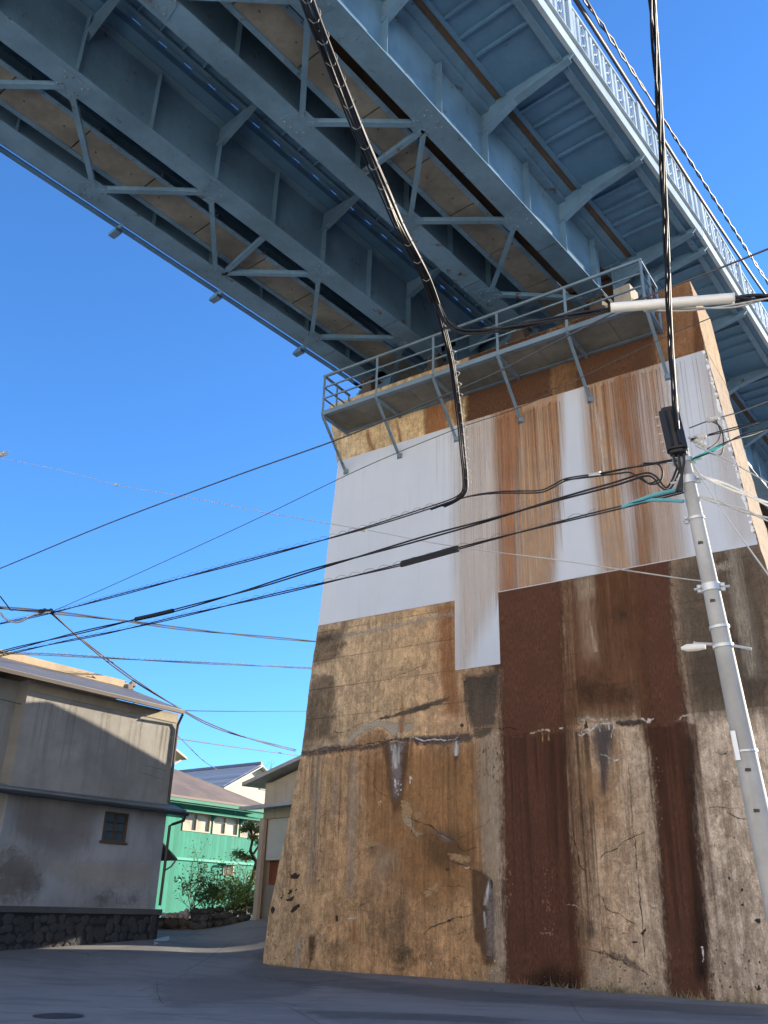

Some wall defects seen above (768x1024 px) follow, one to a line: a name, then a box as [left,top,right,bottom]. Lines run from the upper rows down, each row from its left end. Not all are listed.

rust [425,282,714,1000]
damp [345,669,501,965]
crack [411,819,491,934]
damp [578,722,619,793]
crack [566,766,660,976]